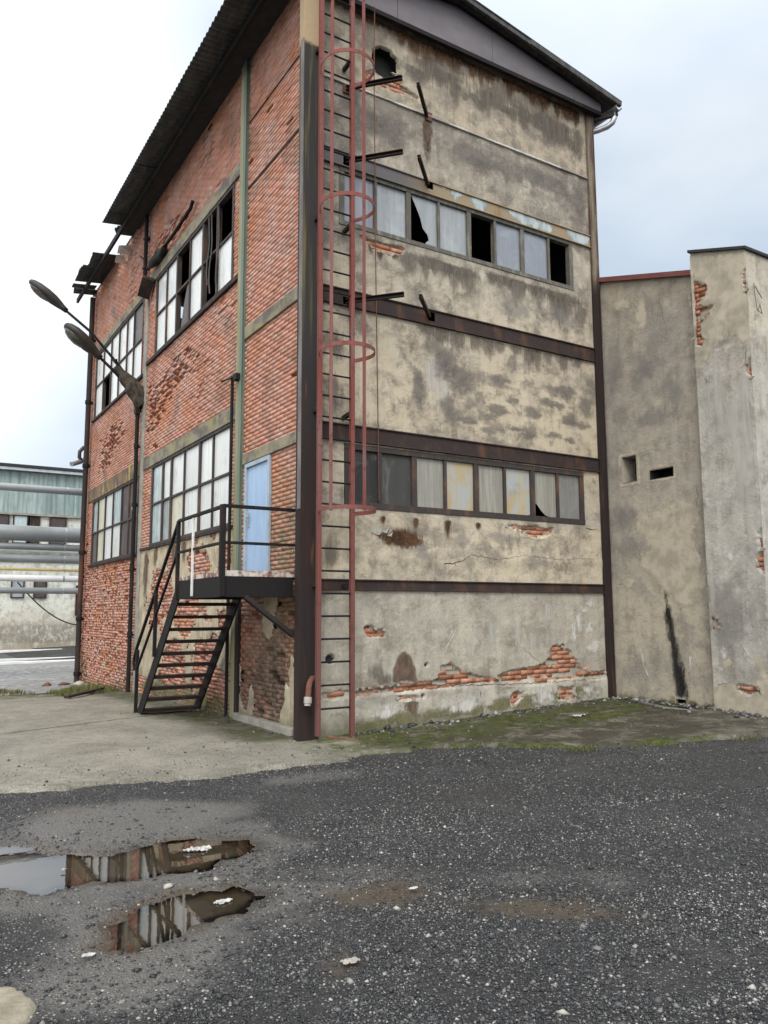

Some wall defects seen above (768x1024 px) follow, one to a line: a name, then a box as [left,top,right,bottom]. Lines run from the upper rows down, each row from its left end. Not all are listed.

spalling [365,47,411,95]
flaking render [359,236,403,256]
peeling [692,252,751,369]
damp [424,326,580,391]
damp [413,372,426,405]
damp [443,386,592,444]
peeling [370,525,393,537]
flaking render [505,524,552,538]
flaking render [364,626,386,637]
damp [665,594,688,698]
flaking render [324,645,607,708]
peeling [714,656,768,716]